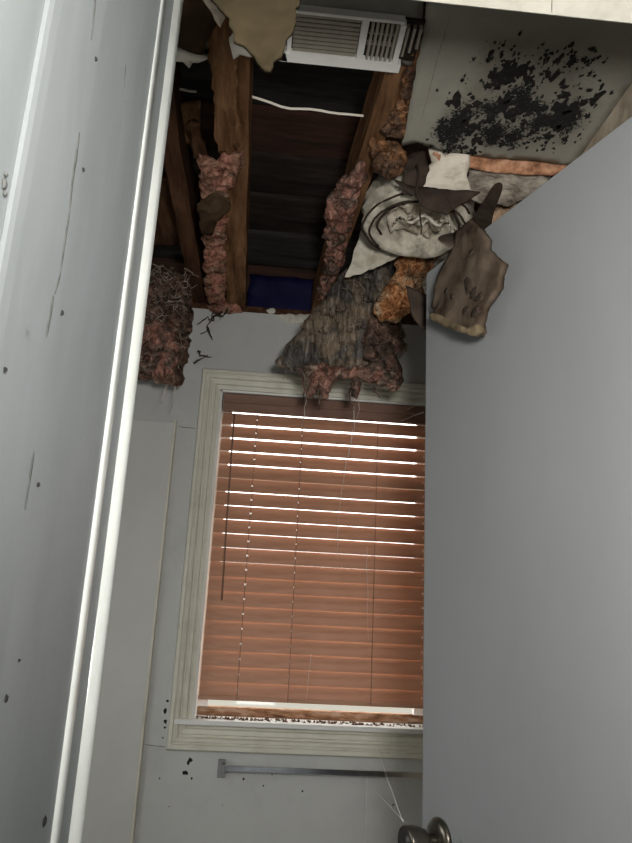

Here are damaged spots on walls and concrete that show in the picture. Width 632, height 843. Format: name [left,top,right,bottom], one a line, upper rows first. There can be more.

water stain [420,30,614,156]
peeling [266,308,310,325]
spalling [429,313,485,338]